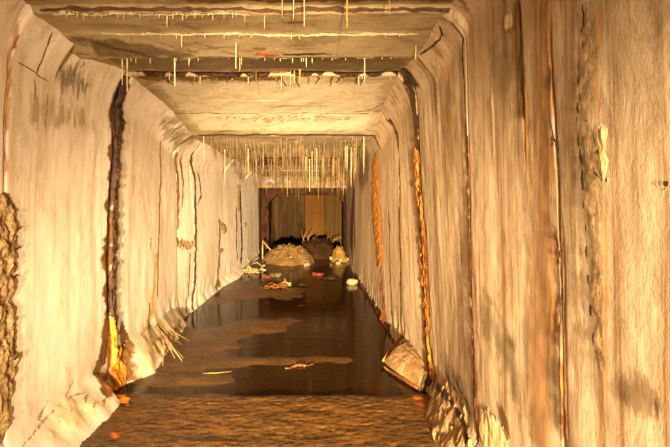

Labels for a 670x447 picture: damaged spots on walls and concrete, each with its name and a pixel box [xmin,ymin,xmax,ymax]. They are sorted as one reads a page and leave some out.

crack [18,33,52,97]
water stain [60,63,87,97]
water stain [74,23,418,70]
water stain [252,157,342,166]
crack [40,0,479,443]
spalling [0,192,20,445]
spalling [426,380,509,447]